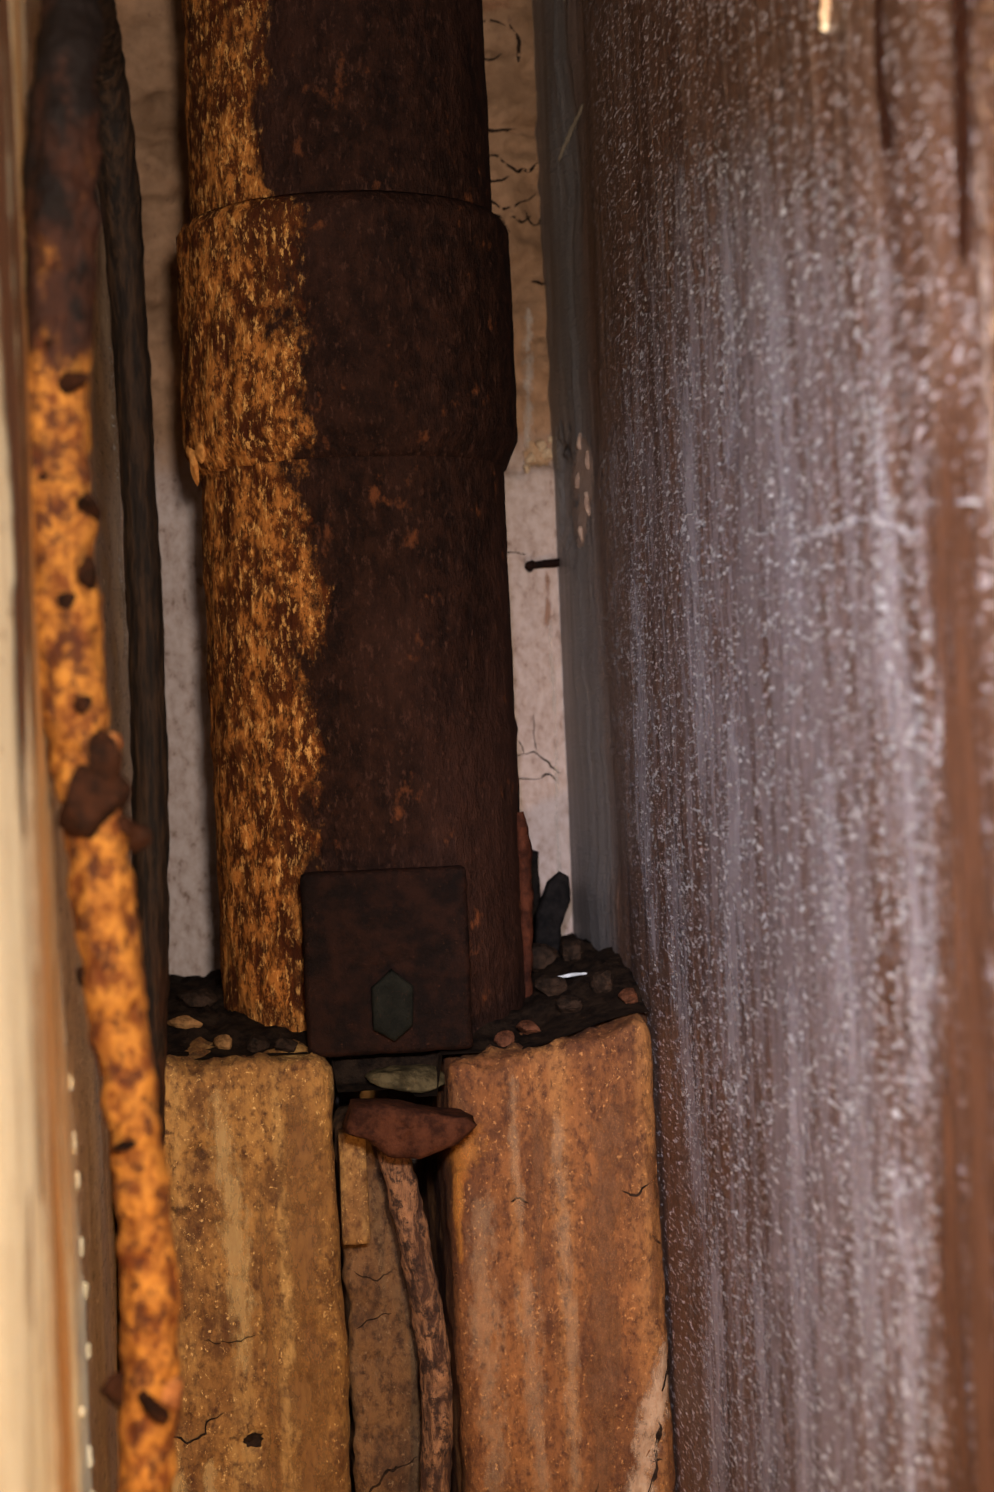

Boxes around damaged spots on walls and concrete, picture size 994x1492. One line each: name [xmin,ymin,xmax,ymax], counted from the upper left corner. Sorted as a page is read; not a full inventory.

damp [874,0,892,151]
damp [951,0,972,263]
corrosion [186,441,206,486]
crack [517,714,561,783]
damp [607,127,994,1492]
crack [176,1413,223,1444]